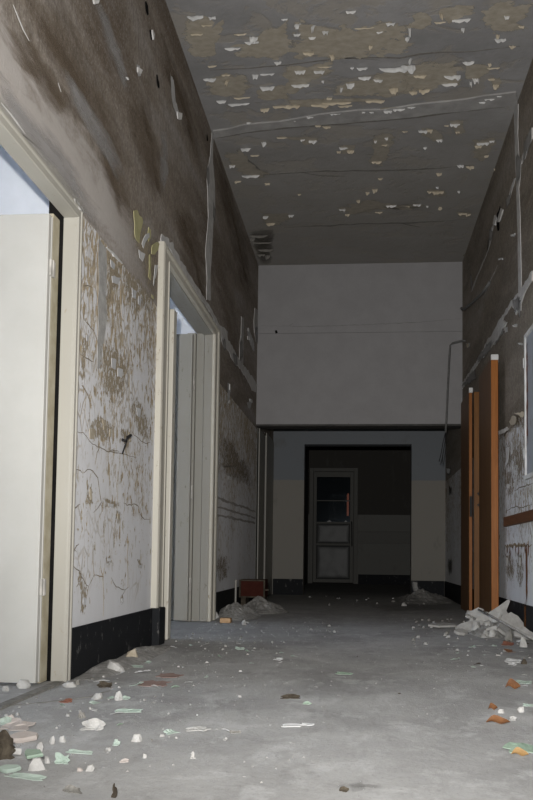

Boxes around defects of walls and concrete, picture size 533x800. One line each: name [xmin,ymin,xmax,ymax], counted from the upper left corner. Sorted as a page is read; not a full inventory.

spalling [171,76,183,120]
peeling [181,0,533,129]
peeling [224,142,270,186]
crack [219,107,503,177]
peeling [418,120,466,150]
peeling [457,137,496,171]
spalling [493,206,504,231]
peeling [106,210,159,317]
peeling [88,340,150,451]
crack [75,431,150,520]
peeling [498,411,524,496]
crack [74,544,128,612]